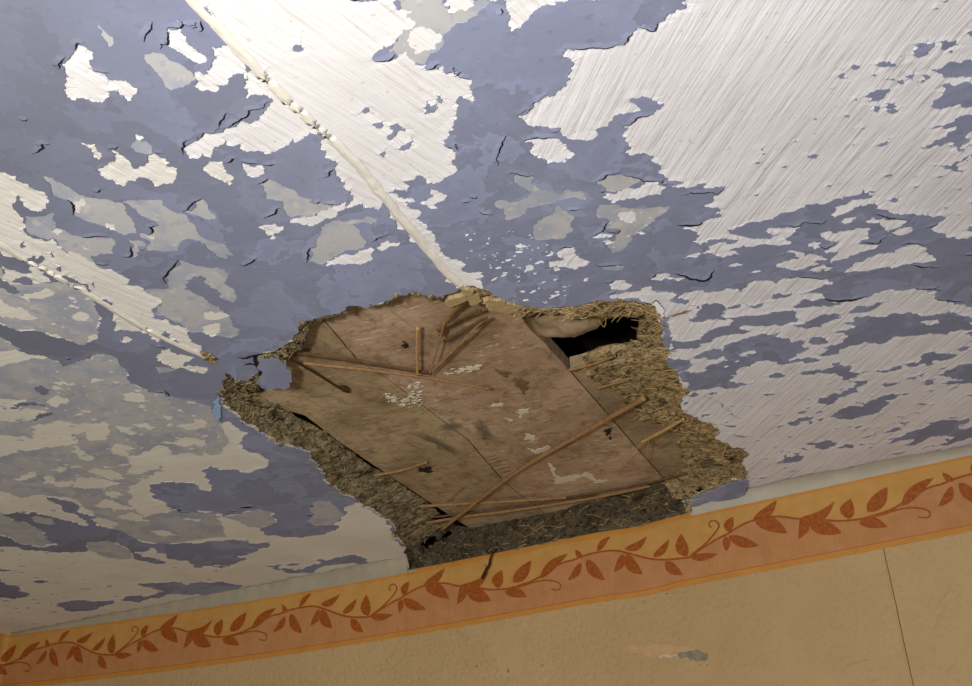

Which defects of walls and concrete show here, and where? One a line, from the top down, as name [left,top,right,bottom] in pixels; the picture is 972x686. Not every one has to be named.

peeling [144,0,589,314]
peeling [518,0,972,503]
peeling [383,382,424,408]
peeling [443,364,482,375]
spalling [495,369,530,395]
flaking render [677,650,709,662]